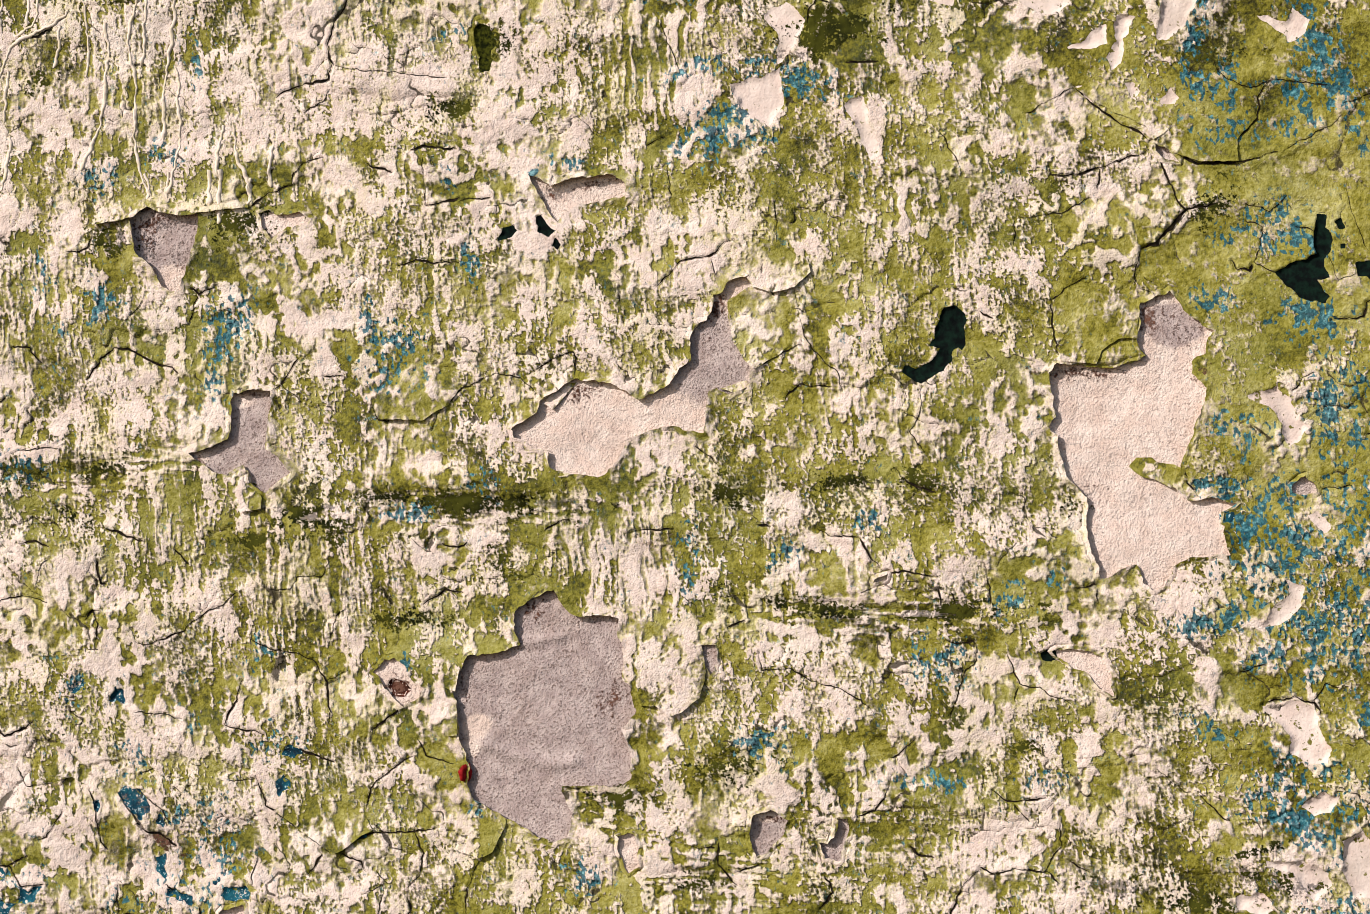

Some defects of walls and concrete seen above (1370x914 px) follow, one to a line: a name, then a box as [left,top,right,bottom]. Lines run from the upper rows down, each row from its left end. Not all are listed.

peeling [89,195,316,298]
peeling [522,167,642,250]
crack [1013,60,1370,320]
peeling [1275,214,1346,303]
peeling [502,241,811,489]
peeling [903,305,967,383]
peeling [182,381,301,512]
peeling [1041,278,1244,596]
crack [370,693,420,732]
peeling [368,578,722,859]
crack [229,739,453,914]
crack [465,860,479,909]